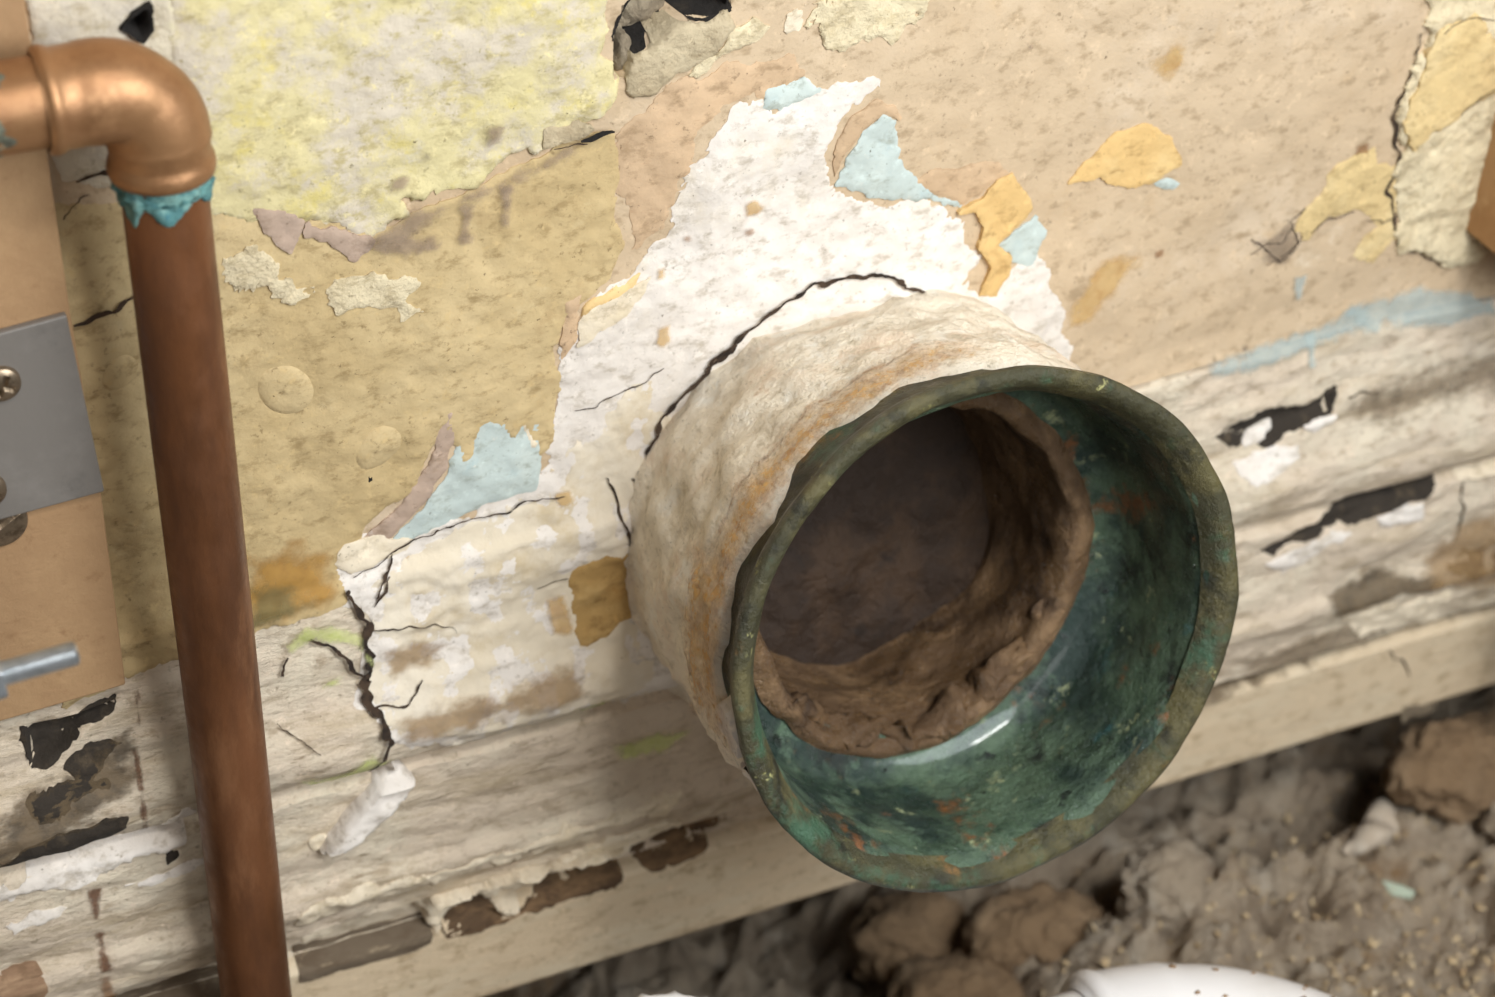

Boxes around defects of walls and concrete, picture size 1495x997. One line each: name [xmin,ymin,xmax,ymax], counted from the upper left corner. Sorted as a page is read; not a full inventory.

spalling [1295,0,1495,269]
crack [279,496,565,772]
peeling [25,0,1073,857]
crack [576,273,926,546]
peeling [1216,385,1338,488]
peeling [1256,456,1495,573]
peeling [0,690,204,935]
peeling [294,790,726,944]